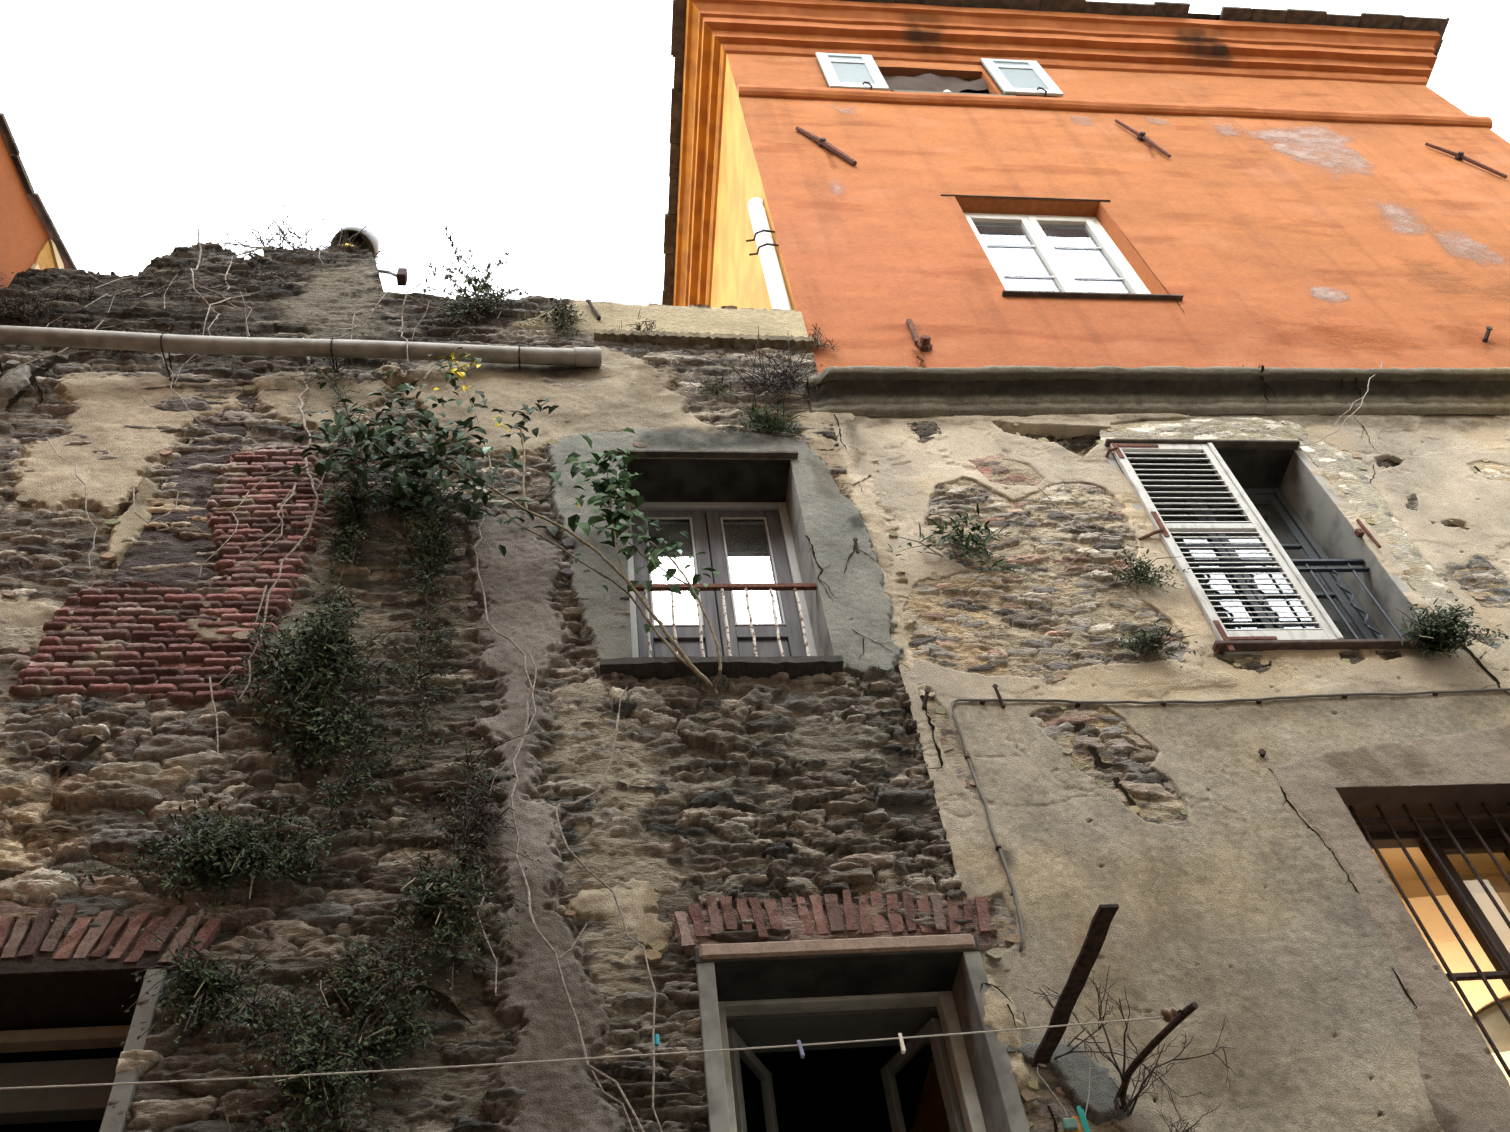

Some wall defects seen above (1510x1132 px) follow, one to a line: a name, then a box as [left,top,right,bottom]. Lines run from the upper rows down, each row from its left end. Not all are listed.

water stain [909,29,933,42]
water stain [1181,34,1228,57]
peeling [1258,128,1366,168]
peeling [1384,206,1502,261]
flaking render [0,346,765,566]
flaking render [1013,414,1510,649]
flaking render [181,602,250,643]
flaking render [791,411,1272,793]
crack [1459,643,1510,695]
crack [926,707,943,769]
flaking render [1030,706,1189,828]
crack [1268,768,1358,892]